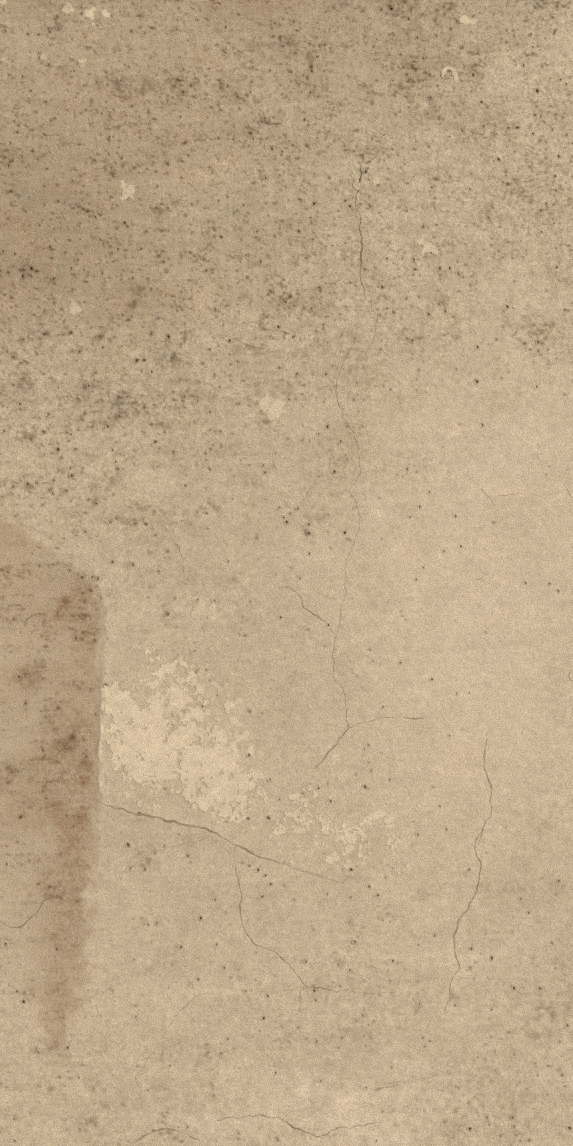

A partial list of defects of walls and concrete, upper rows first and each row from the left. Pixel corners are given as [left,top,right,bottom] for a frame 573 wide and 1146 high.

crack [284,153,424,769]
damp [0,515,107,1064]
peeling [97,648,415,880]
crack [98,738,492,1016]
crack [119,1114,382,1143]
crack [374,1073,448,1091]